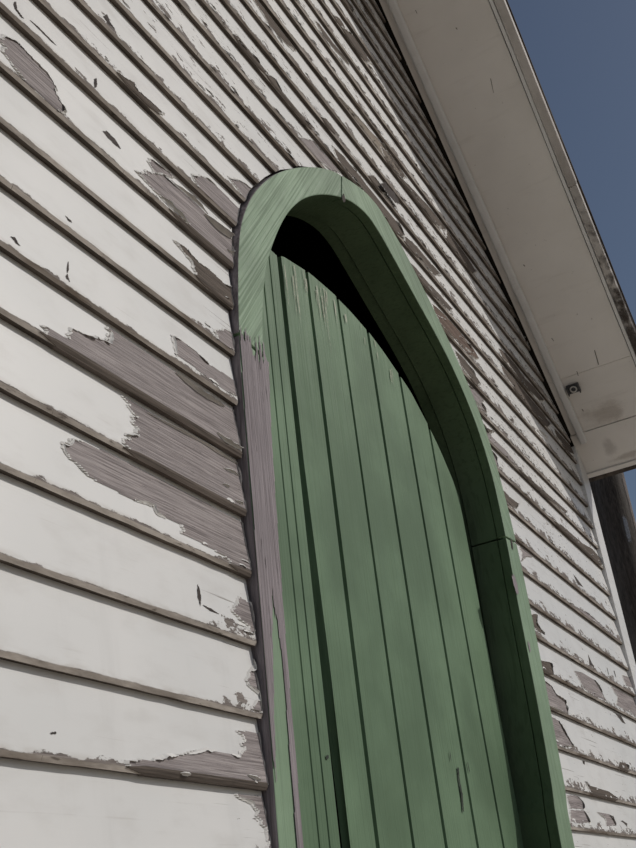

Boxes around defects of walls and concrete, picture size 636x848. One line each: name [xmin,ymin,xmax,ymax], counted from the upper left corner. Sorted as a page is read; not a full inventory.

peeling [0,34,67,116]
peeling [289,0,403,106]
peeling [134,158,240,269]
peeling [172,239,234,308]
peeling [232,33,603,565]
peeling [39,322,304,848]
peeling [532,613,545,638]
peeling [541,660,579,717]
peeling [574,671,636,716]
peeling [552,717,598,759]
peeling [566,781,629,831]